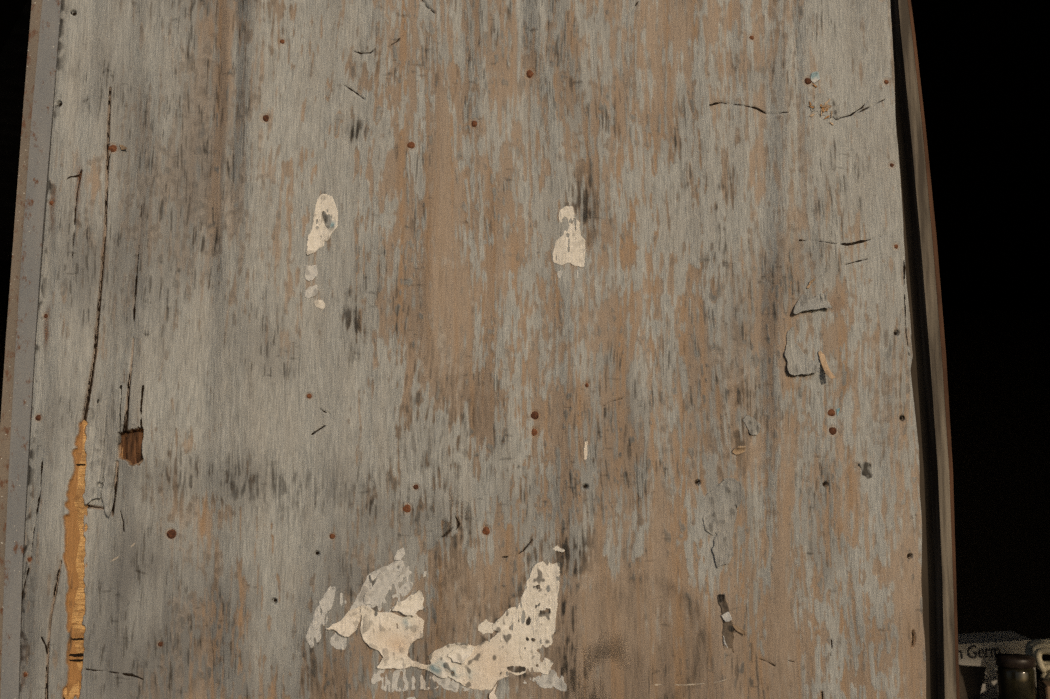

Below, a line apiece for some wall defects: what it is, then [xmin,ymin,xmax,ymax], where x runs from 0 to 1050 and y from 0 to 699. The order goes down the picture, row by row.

crack [709,102,789,114]
crack [839,99,885,119]
crack [66,170,82,259]
crack [83,87,144,442]
peeling [304,194,338,309]
peeling [552,206,586,279]
crack [799,236,881,265]
peeling [785,327,836,379]
peeling [305,545,567,699]